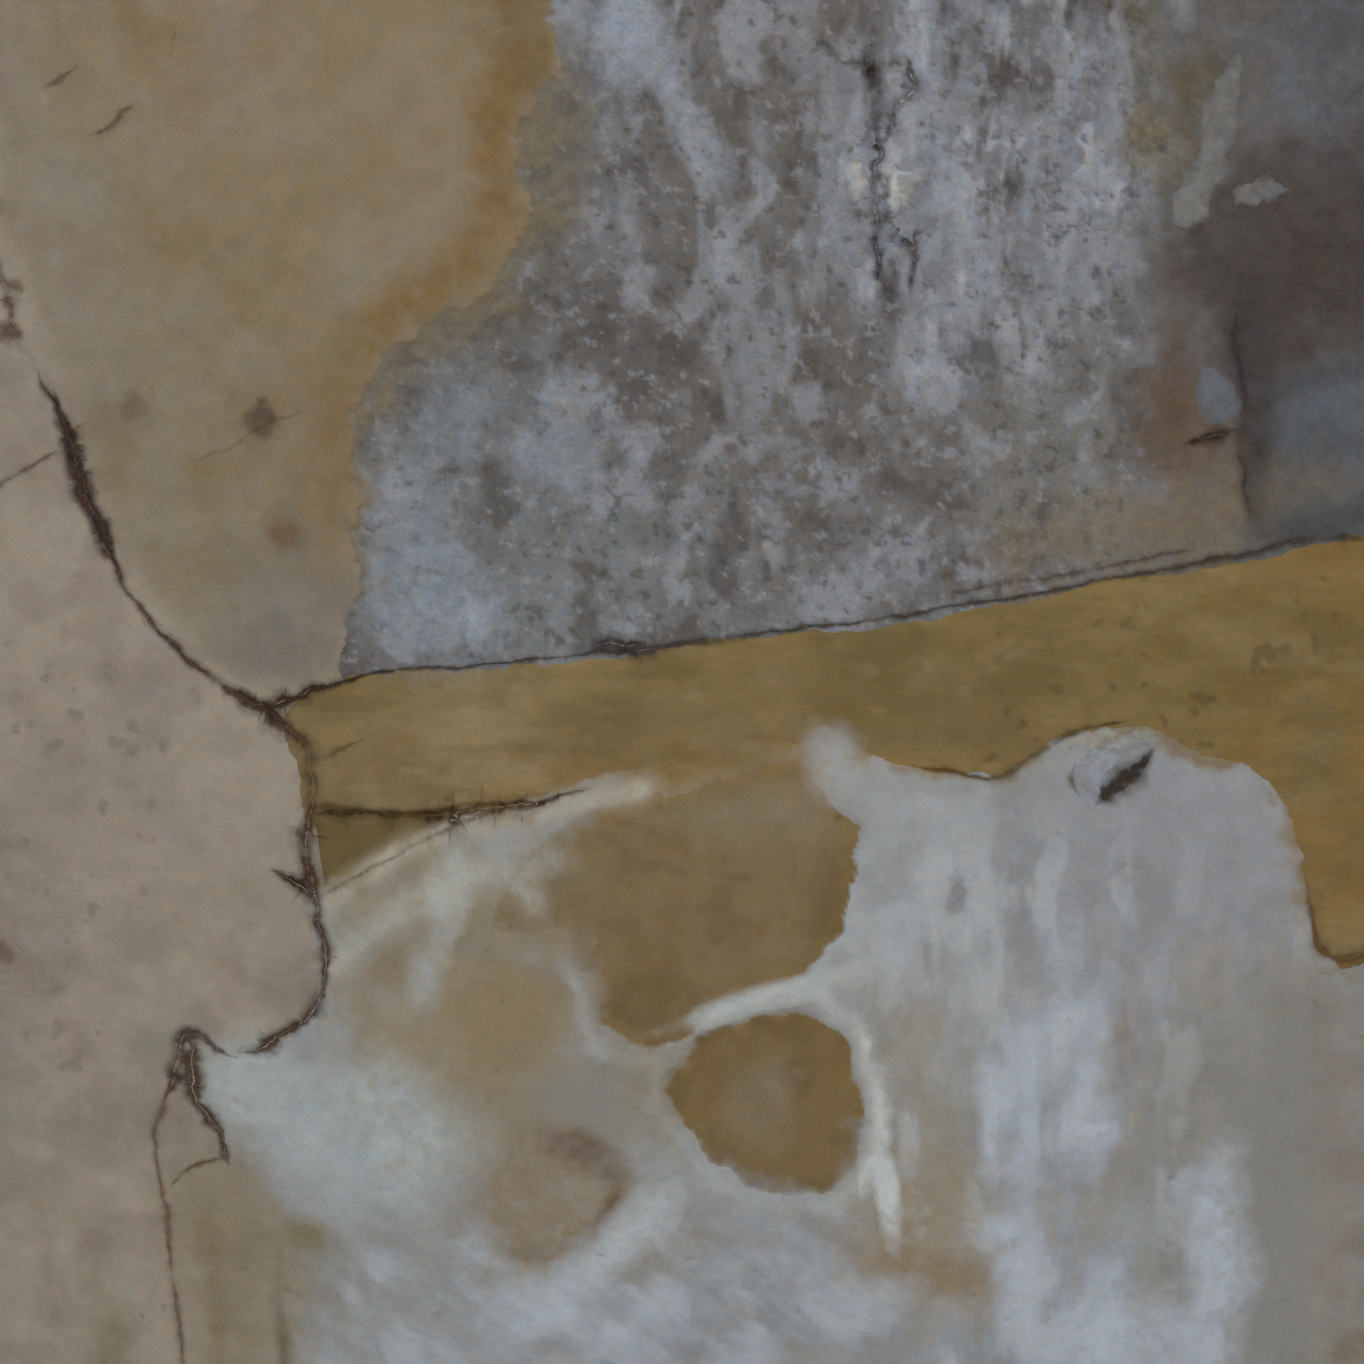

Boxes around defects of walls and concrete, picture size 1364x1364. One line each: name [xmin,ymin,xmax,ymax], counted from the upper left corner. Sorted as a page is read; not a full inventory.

crack [4,297,13,325]
spalling [340,633,374,678]
leakage [27,765,781,1364]
crack [0,383,1305,1356]
leakage [632,949,938,1364]
flaking render [286,705,1354,1364]
efflorescence [795,712,870,813]
spalling [365,0,1364,669]
crack [871,63,917,183]
crack [872,235,918,284]
efflorescence [957,846,1273,1364]
crack [1338,533,1360,541]